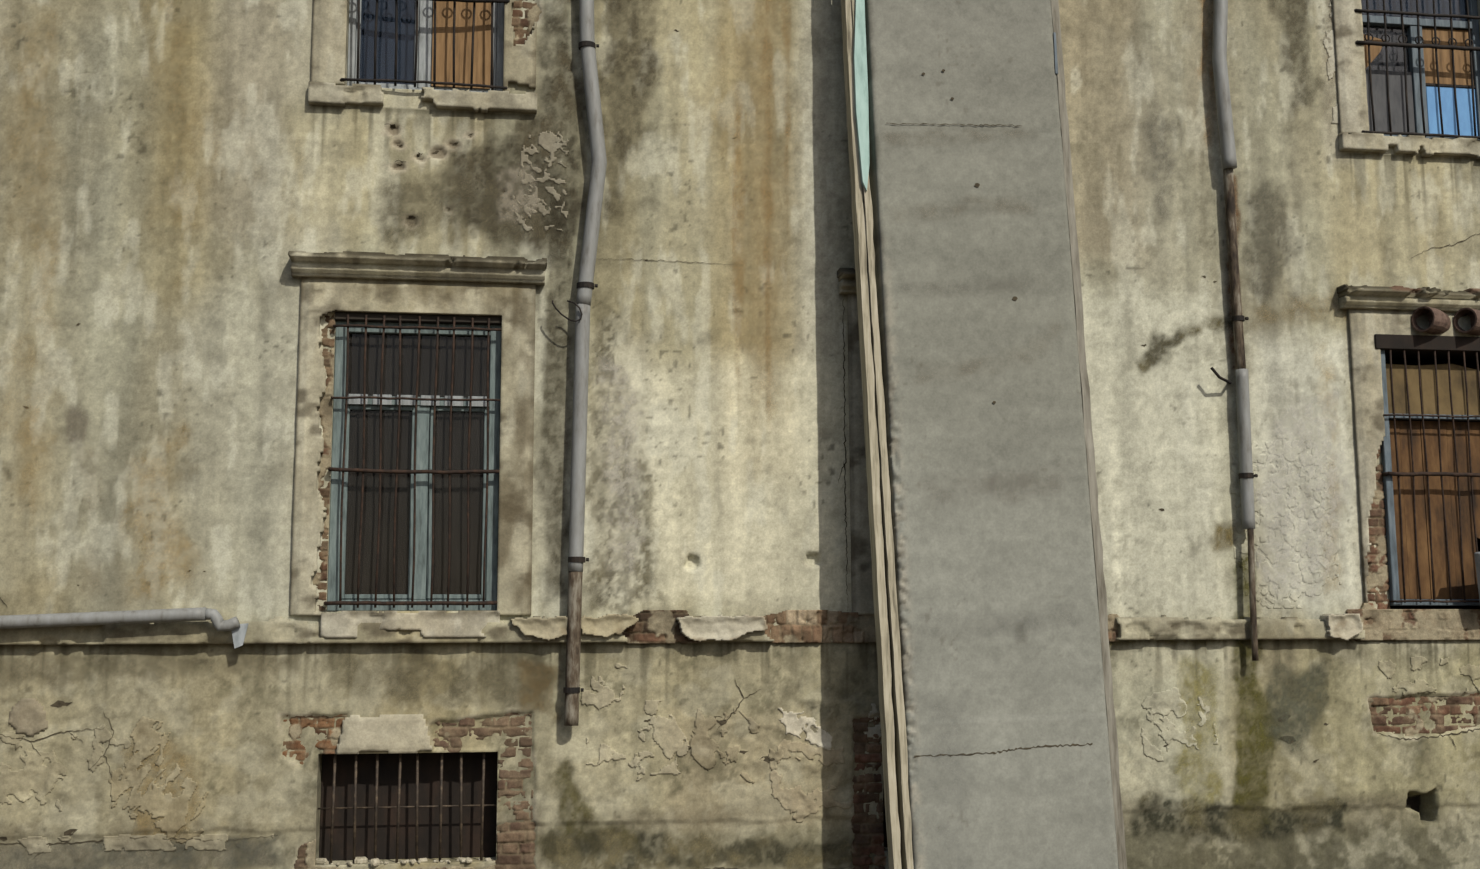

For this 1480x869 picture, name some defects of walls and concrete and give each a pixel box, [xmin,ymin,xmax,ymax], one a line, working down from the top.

damp [599,0,656,113]
damp [1272,0,1308,107]
damp [438,15,582,268]
damp [1247,189,1287,294]
flaking render [313,313,335,611]
damp [544,292,569,593]
flaking render [1320,447,1393,641]
peeling [510,614,639,641]
peeling [677,615,768,642]
flaking render [1368,656,1480,736]
flaking render [418,712,536,869]
flaking render [586,699,886,869]